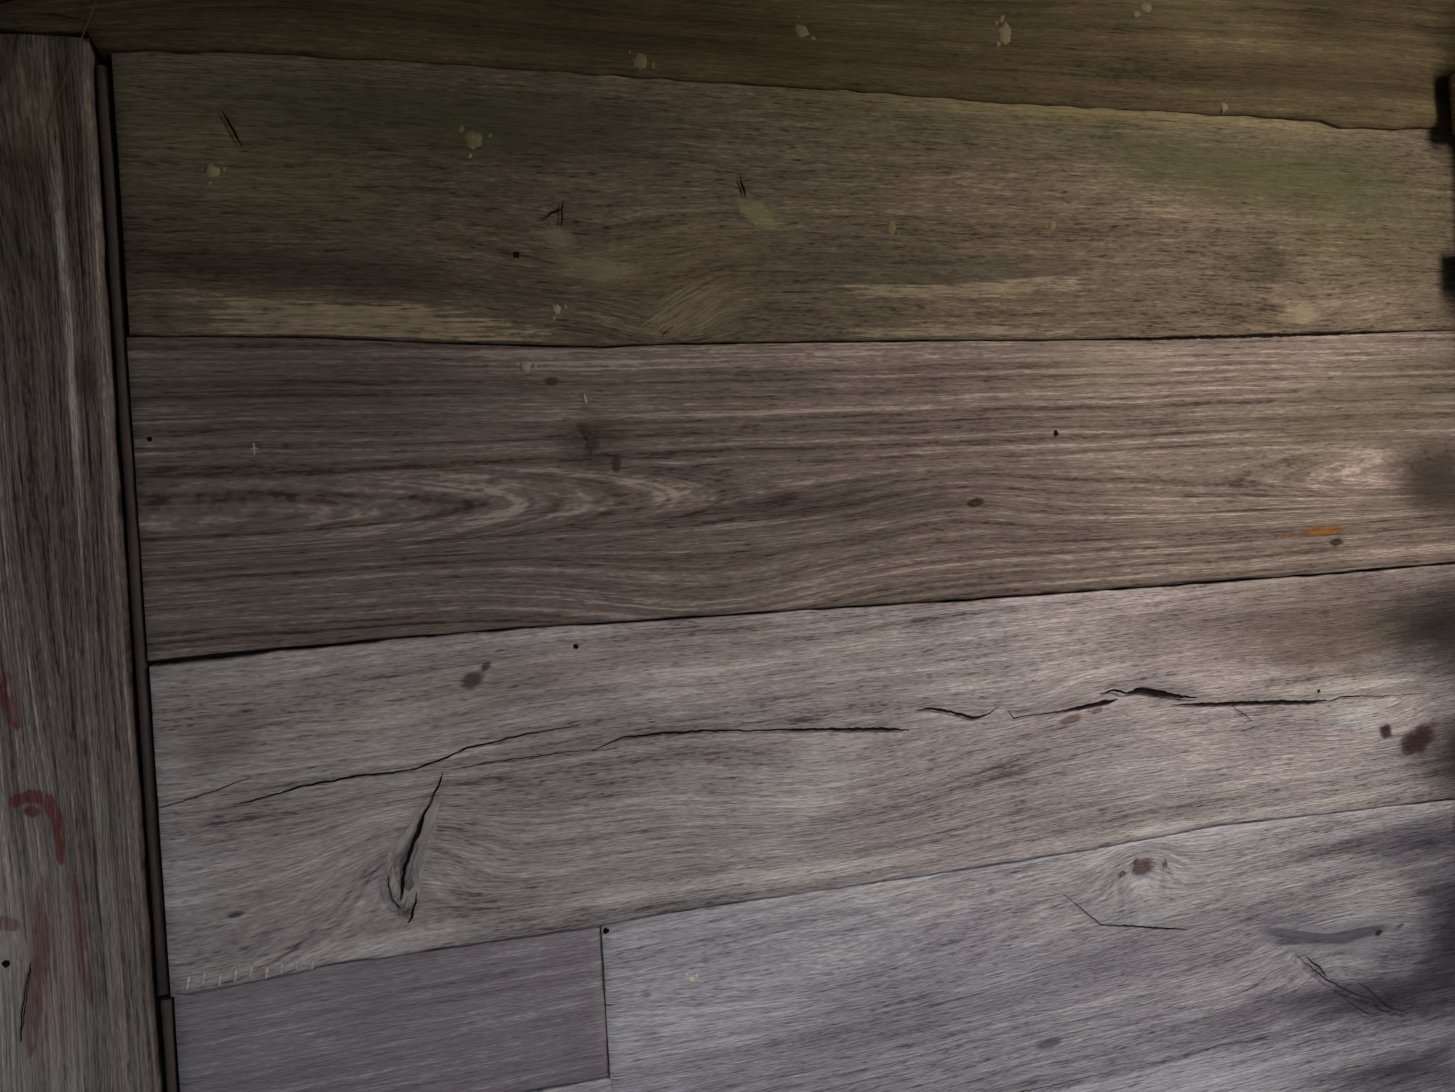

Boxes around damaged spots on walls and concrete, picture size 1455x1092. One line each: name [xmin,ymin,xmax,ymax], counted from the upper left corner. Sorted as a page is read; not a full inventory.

crack [160,687,1425,923]